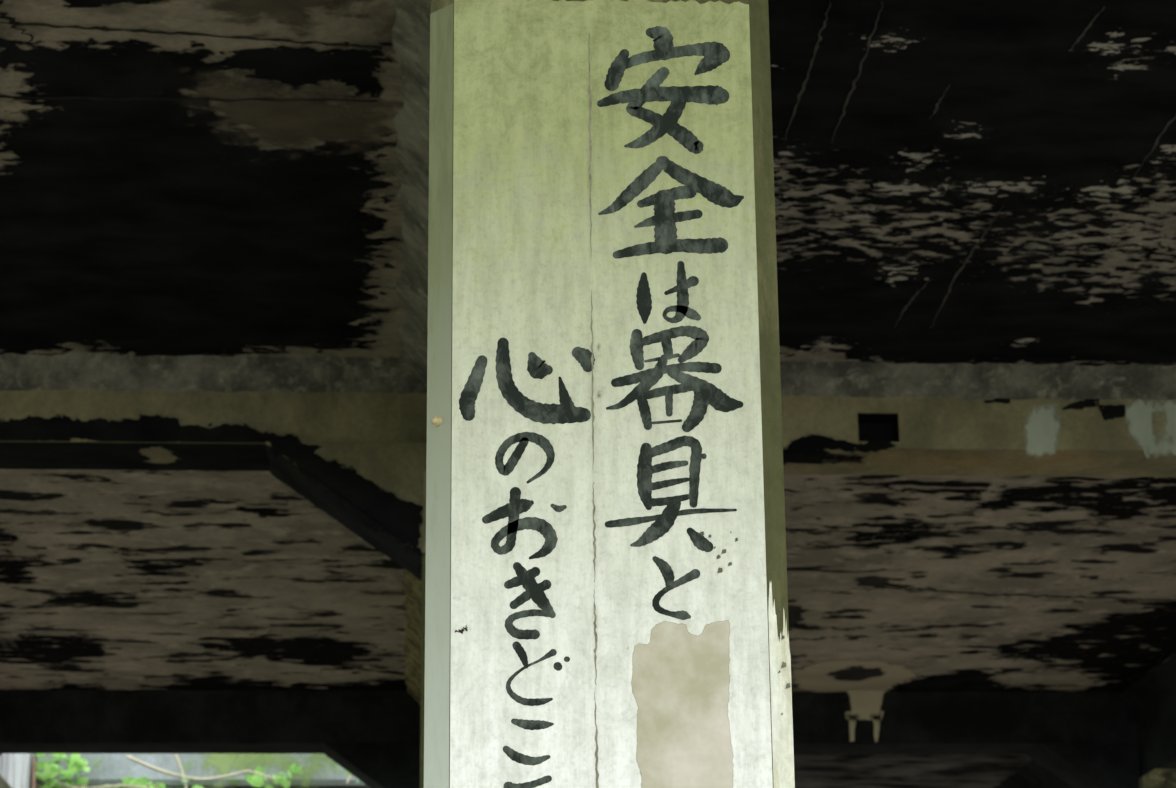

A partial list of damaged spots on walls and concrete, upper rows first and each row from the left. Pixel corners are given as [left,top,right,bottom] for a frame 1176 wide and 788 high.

leakage [208,0,361,36]
leakage [182,68,404,151]
peeling [632,620,733,788]